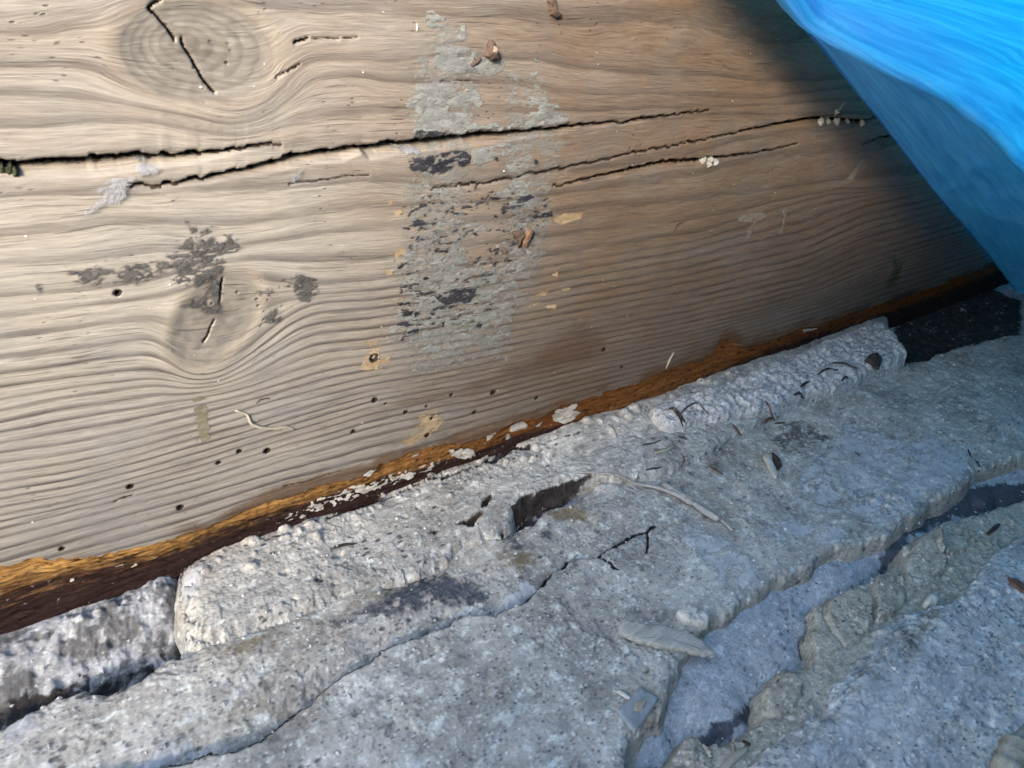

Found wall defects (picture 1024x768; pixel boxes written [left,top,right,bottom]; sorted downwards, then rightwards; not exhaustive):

crack [147,0,215,92]
peeling [407,10,570,207]
crack [1,109,709,189]
crack [431,116,891,190]
peeling [554,213,583,225]
peeling [361,218,556,374]
peeling [401,410,443,446]
crack [378,431,580,502]
spalling [459,495,492,527]
crack [488,526,656,617]
crack [168,619,459,767]